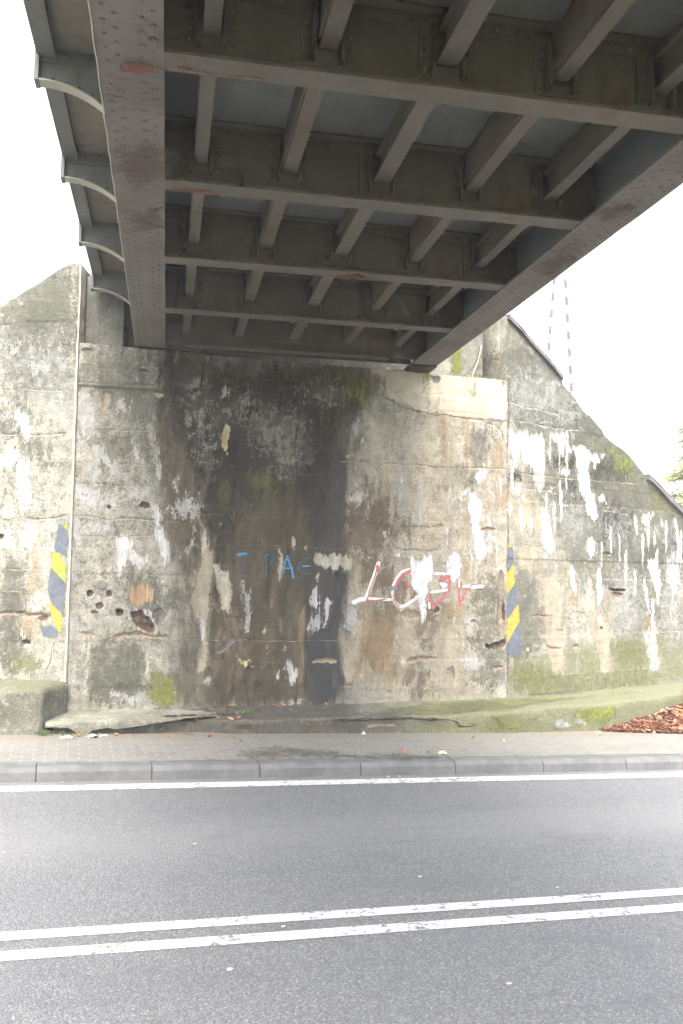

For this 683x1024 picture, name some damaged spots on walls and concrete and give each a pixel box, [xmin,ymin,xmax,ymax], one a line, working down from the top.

leakage [0,588,35,652]
leakage [0,390,55,555]
spalling [85,580,168,640]
leakage [72,350,683,734]
crack [289,370,633,578]
crack [322,714,538,728]